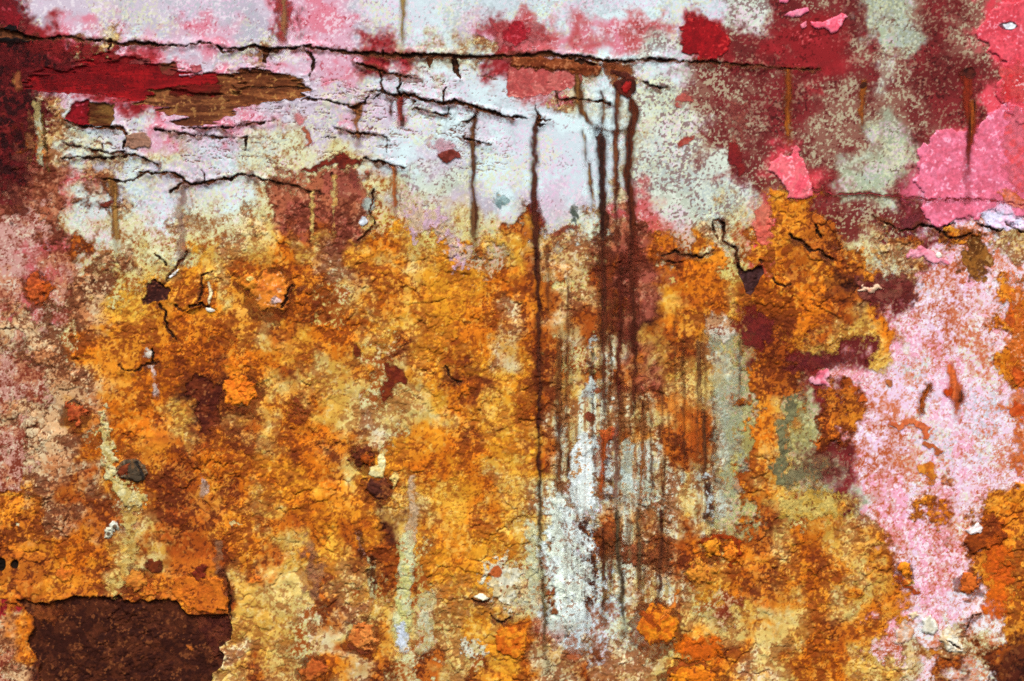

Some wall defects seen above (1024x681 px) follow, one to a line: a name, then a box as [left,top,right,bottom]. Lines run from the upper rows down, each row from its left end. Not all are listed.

peeling [23,51,311,127]
crack [0,27,820,241]
peeling [768,146,813,199]
crack [661,218,792,288]
peeling [753,204,774,245]
crack [789,224,834,263]
corrosion [938,225,1024,476]
corrosion [810,375,868,455]
corrosion [888,416,955,533]
corrosion [954,482,1024,681]
spalling [17,595,232,681]
corrosion [657,634,725,681]